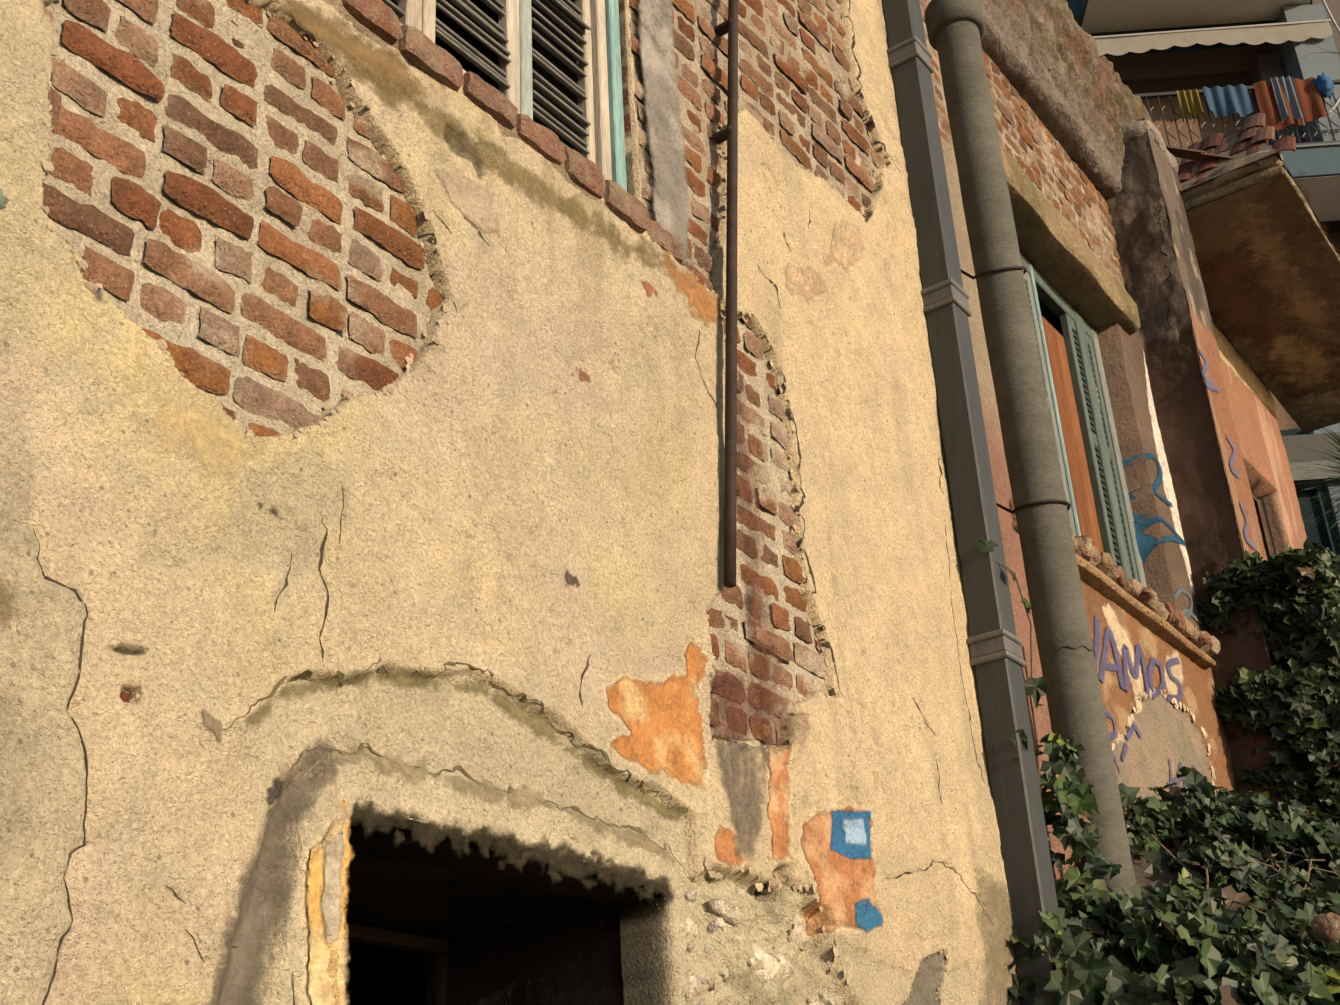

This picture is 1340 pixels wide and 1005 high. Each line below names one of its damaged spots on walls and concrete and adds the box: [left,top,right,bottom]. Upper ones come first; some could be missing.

flaking render [42,0,451,438]
crack [1146,186,1173,330]
crack [274,485,344,667]
flaking render [607,0,895,1005]
crack [33,528,88,1005]
peeling [1102,604,1216,796]
flaking render [903,946,949,1005]
crack [888,861,995,926]